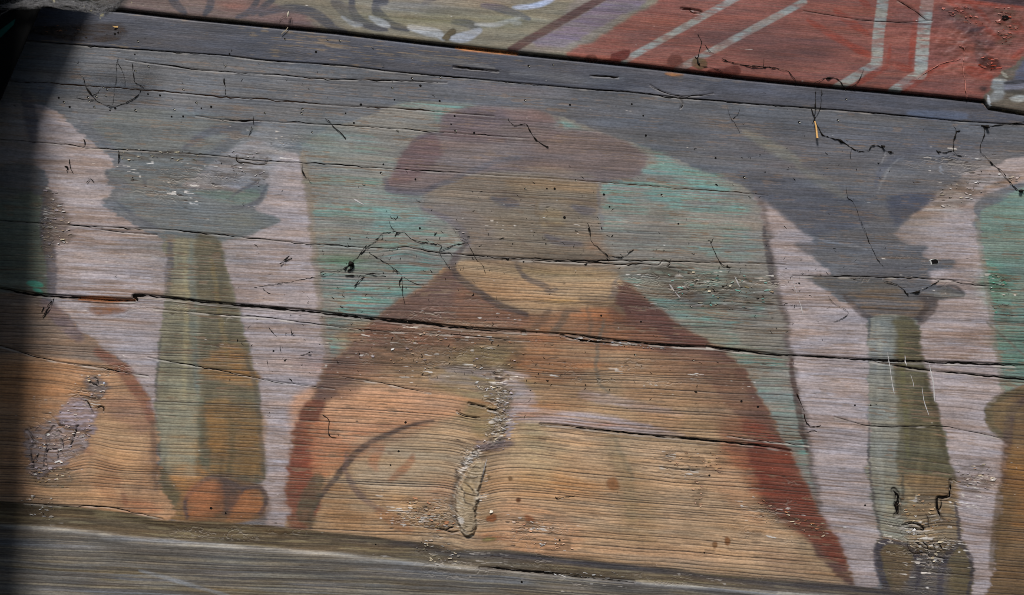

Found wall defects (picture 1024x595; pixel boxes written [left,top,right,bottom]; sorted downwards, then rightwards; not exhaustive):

crack [5,220,765,269]
crack [815,275,985,286]
crack [0,288,1024,380]
peeling [471,339,524,450]
peeling [21,376,110,520]
crack [893,484,951,564]